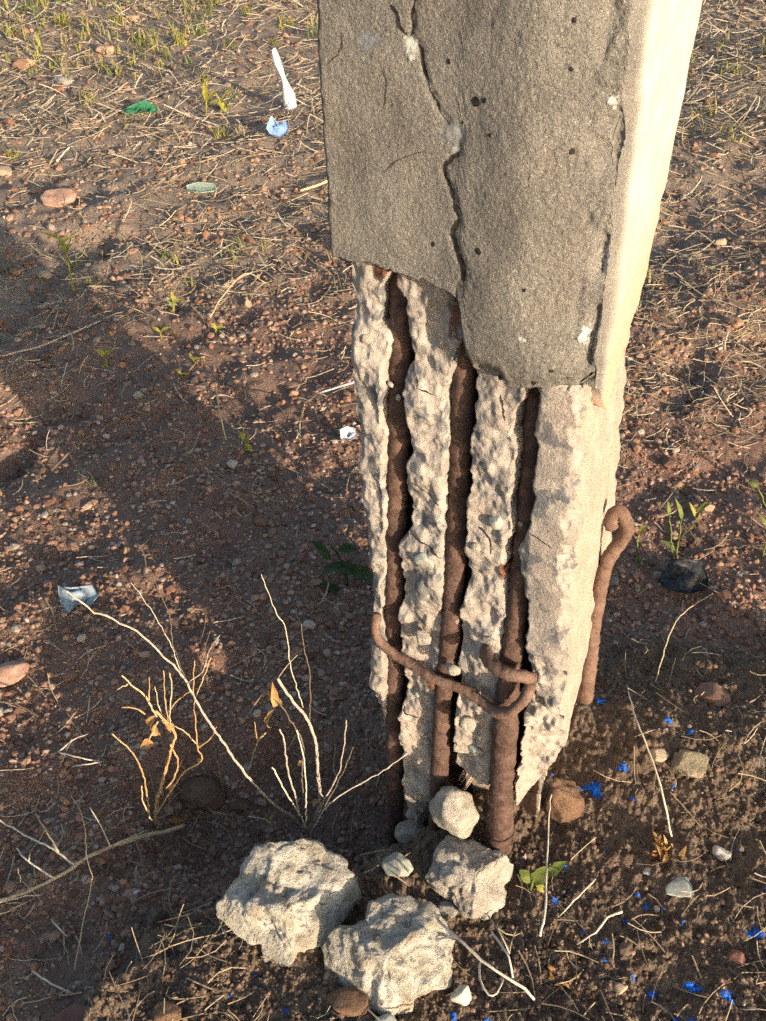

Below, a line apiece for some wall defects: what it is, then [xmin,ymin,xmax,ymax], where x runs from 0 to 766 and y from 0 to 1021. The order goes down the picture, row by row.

crack [382,0,466,292]
corrosion [374,265,397,285]
corrosion [449,299,464,347]
spalling [586,307,599,362]
spalling [351,261,590,827]
corrosion [499,558,512,580]